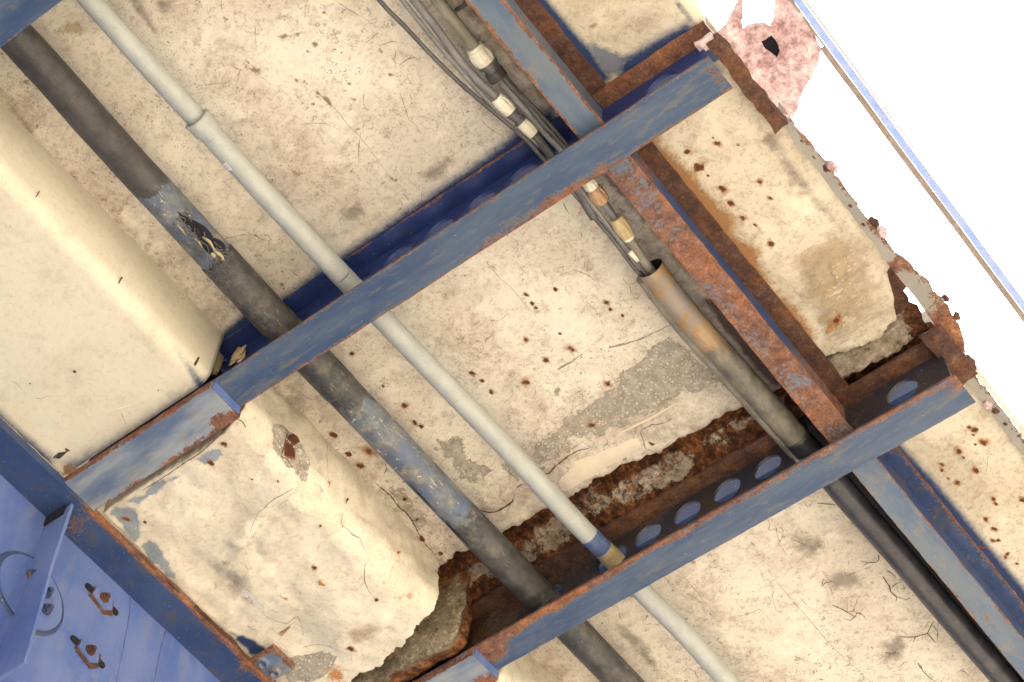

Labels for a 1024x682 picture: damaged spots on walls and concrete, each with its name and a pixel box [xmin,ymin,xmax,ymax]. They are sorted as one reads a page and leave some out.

corrosion [652,138,813,338]
corrosion [706,299,781,386]
corrosion [826,314,842,334]
spalling [827,302,935,385]
peeling [533,337,724,470]
spalling [774,385,802,416]
spalling [272,424,310,482]
peeling [436,436,519,482]
spalling [568,407,766,529]
spalling [502,508,578,566]
spalling [437,549,502,602]